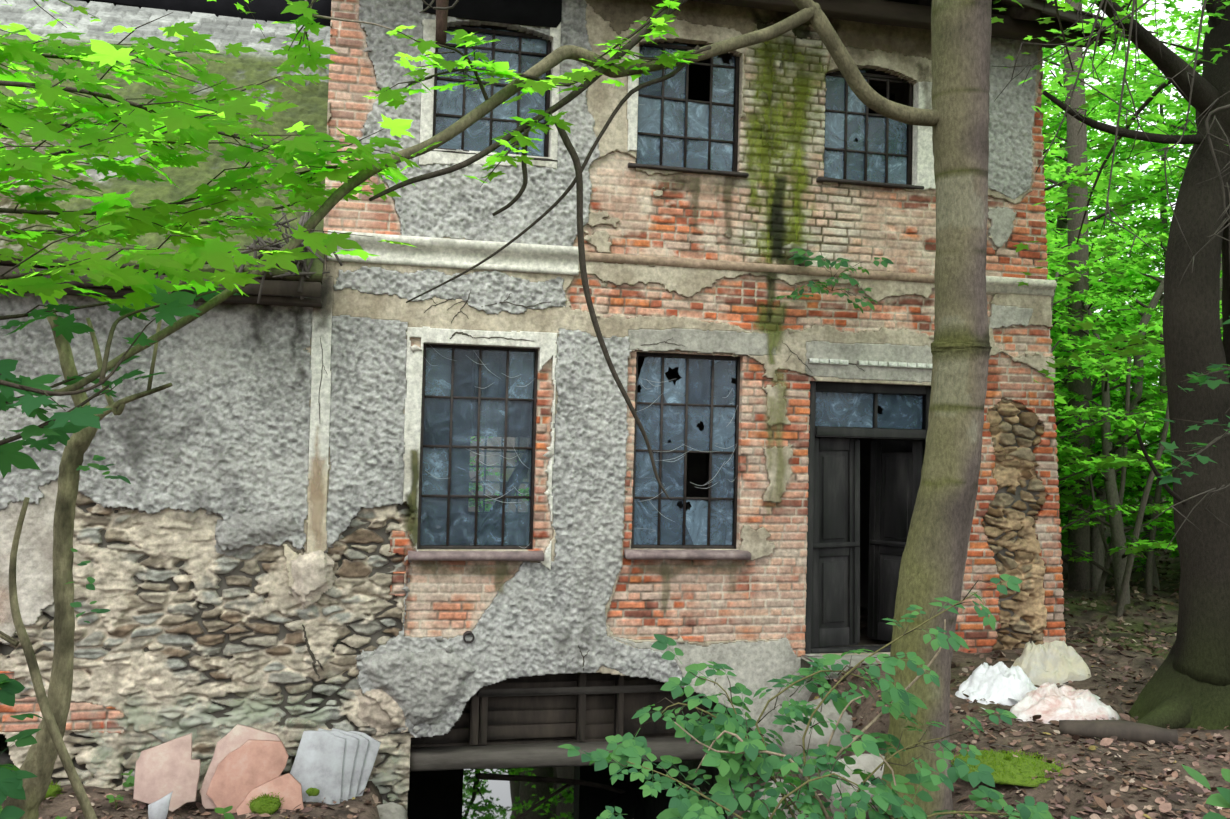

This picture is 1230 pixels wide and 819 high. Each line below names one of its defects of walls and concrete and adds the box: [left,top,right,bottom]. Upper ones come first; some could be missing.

flaking render [323,0,402,235]
damp [664,177,699,227]
flaking render [565,22,936,340]
damp [715,12,822,493]
flaking render [986,74,1050,290]
flaking render [0,602,55,769]
flaking render [50,358,554,819]
flaking render [606,349,816,657]
flaking render [953,294,1066,653]